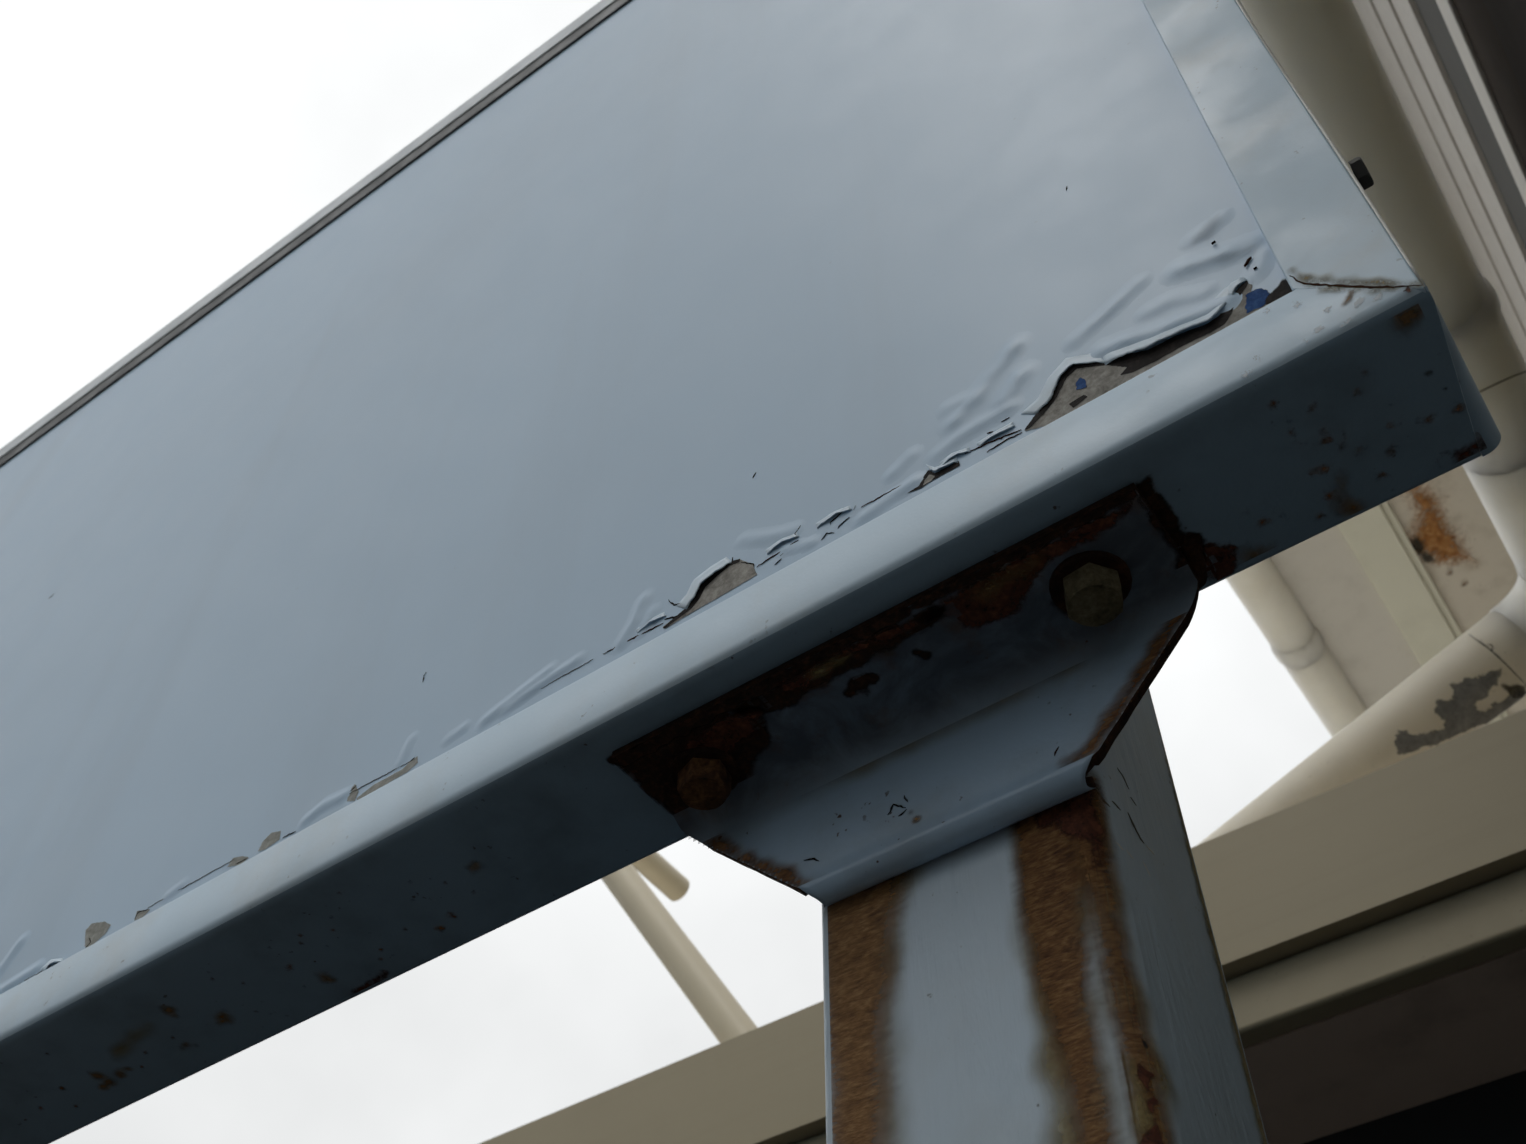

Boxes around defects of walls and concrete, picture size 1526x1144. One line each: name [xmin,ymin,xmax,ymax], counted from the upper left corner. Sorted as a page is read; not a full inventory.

peeling [908,277,1270,493]
rust [1453,436,1487,462]
rust [1318,493,1361,518]
rust [1407,485,1476,565]
peeling [636,532,799,633]
rust [606,476,1263,815]
peeling [1394,669,1526,754]
peeling [347,756,418,801]
peeling [227,831,296,867]
rust [1012,612,1186,1144]
peeling [85,922,111,948]
rust [827,869,912,1144]